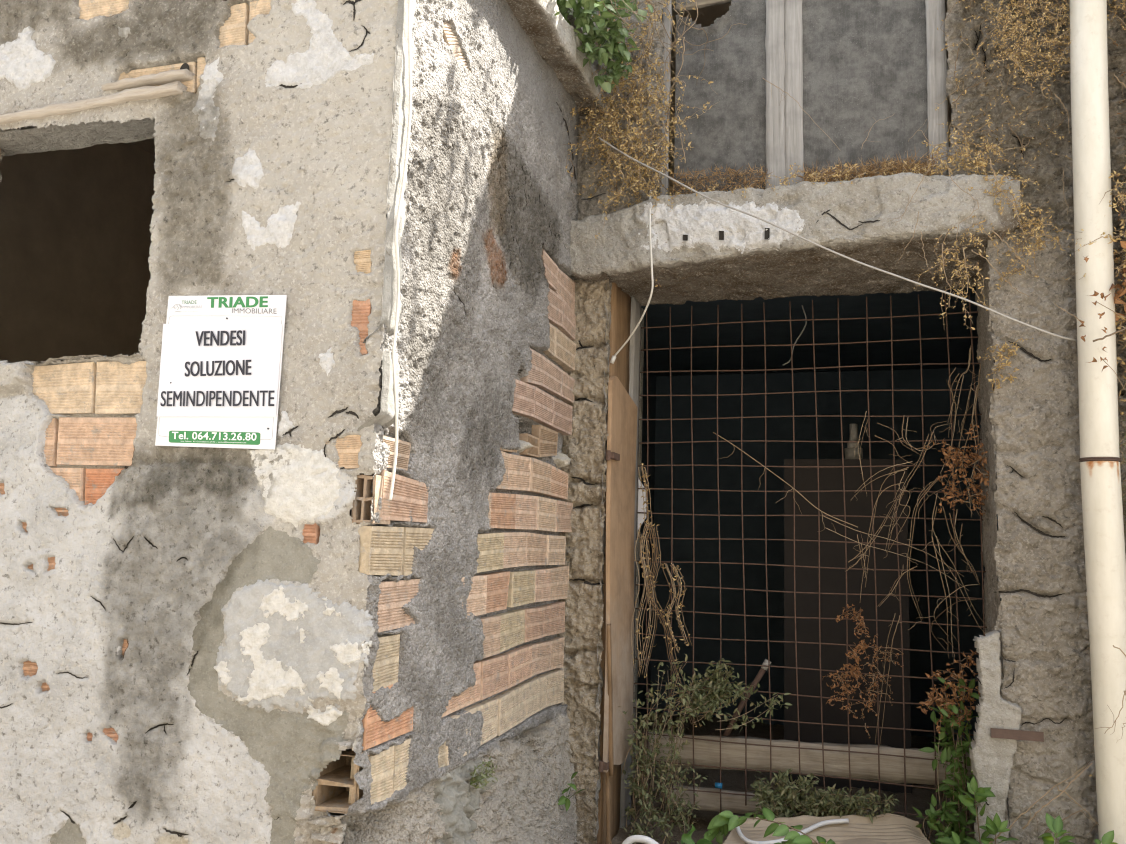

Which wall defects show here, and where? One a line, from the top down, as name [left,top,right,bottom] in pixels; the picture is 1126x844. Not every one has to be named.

peeling [0,26,56,91]
spalling [79,0,130,38]
spalling [118,0,271,141]
peeling [265,0,374,89]
crack [343,0,370,52]
spalling [354,250,372,274]
spalling [351,299,372,355]
spalling [32,361,147,505]
spalling [438,249,576,768]
peeling [50,817,86,844]
peeling [156,832,188,844]